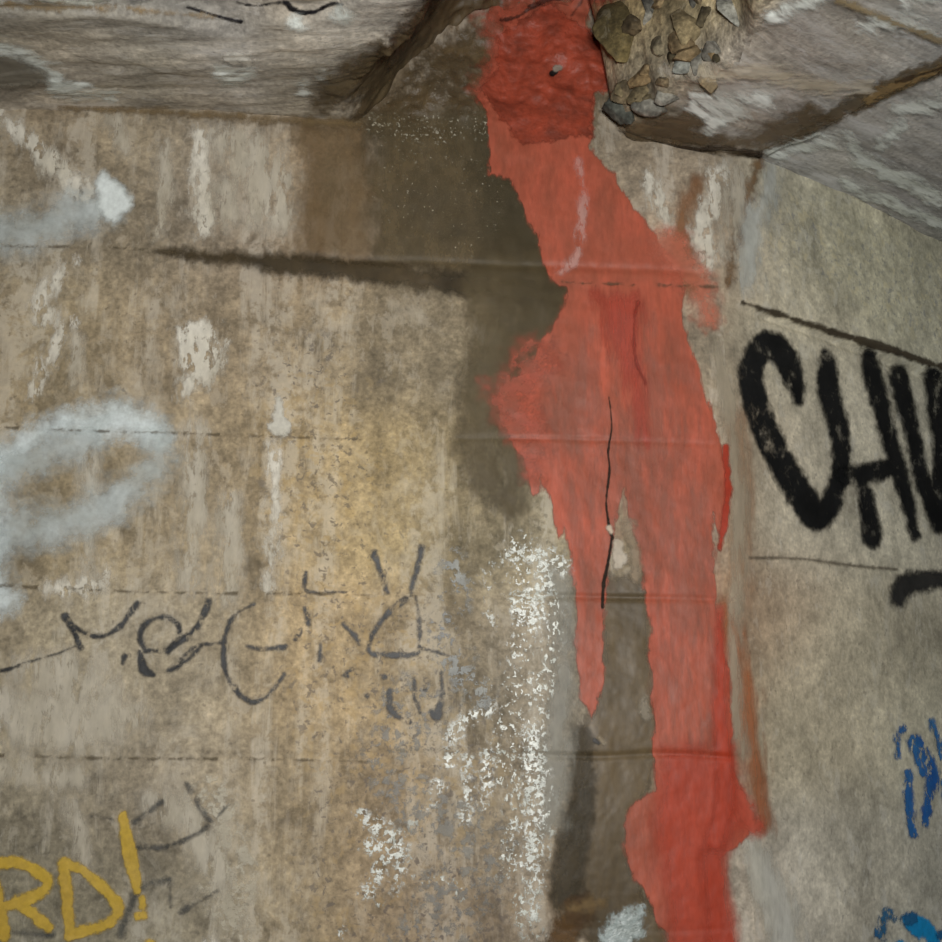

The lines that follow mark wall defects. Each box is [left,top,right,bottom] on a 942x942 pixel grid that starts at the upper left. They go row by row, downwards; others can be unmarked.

crack [187,0,341,23]
spalling [592,0,739,125]
crack [633,301,646,383]
crack [601,400,614,608]